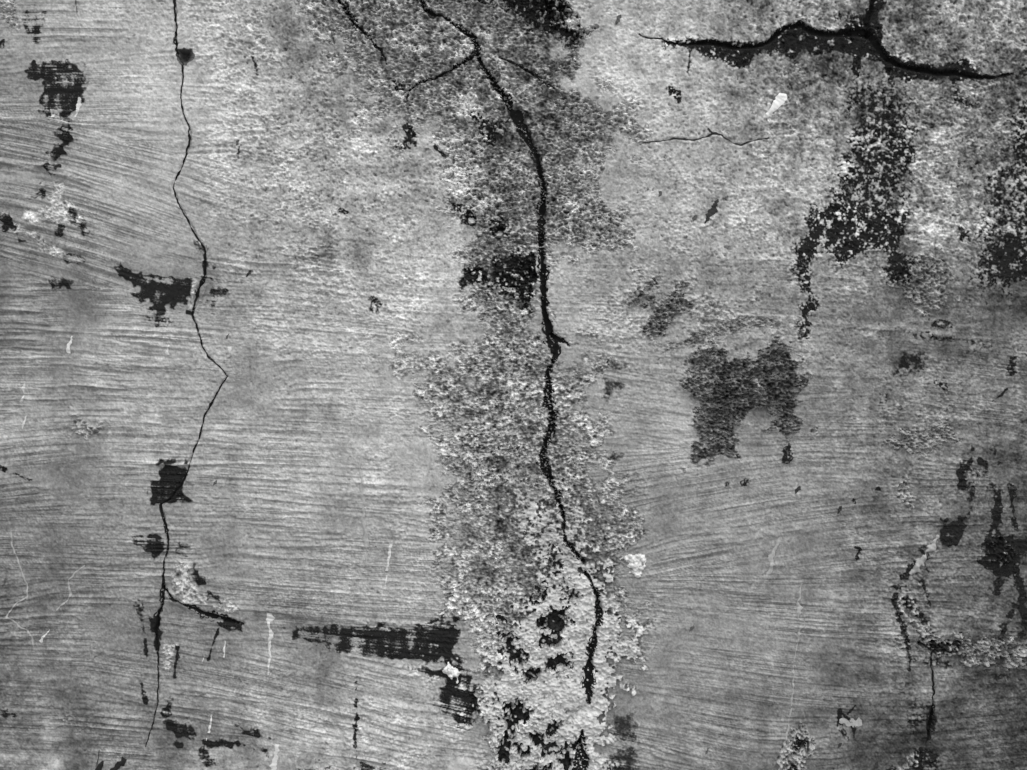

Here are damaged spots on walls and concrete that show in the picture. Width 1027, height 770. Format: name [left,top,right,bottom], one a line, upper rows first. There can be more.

crack [337,0,387,65]
leakage [478,0,584,50]
crack [639,0,1014,80]
leakage [24,59,88,198]
leakage [661,0,1027,339]
leakage [114,240,229,328]
leakage [459,248,539,318]
crack [145,0,244,747]
crack [406,0,604,704]
leakage [150,459,192,505]
leakage [283,432,651,770]
crack [568,729,590,770]